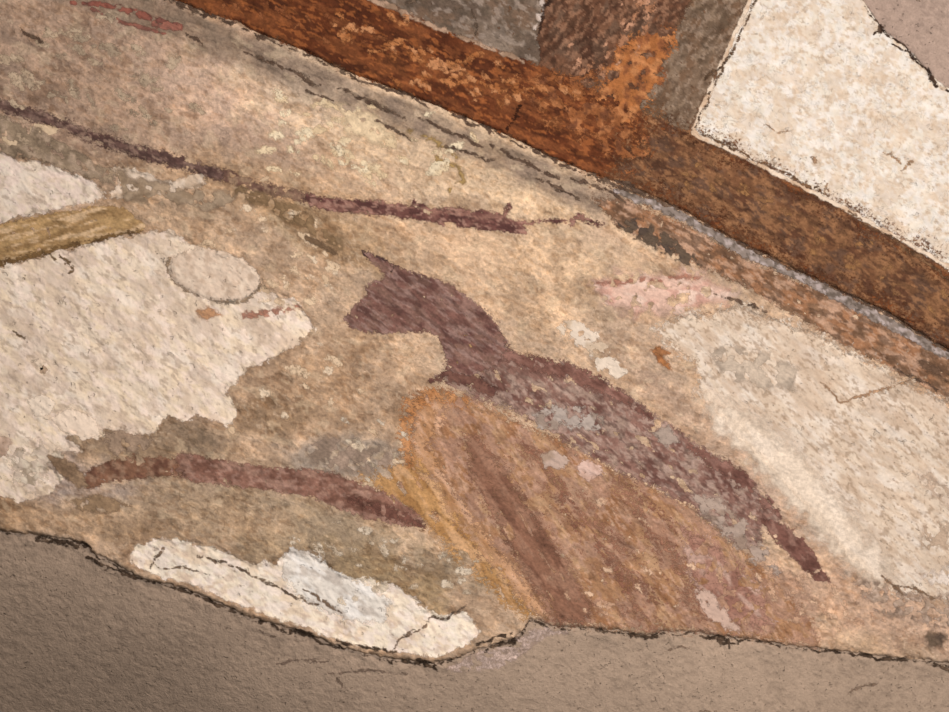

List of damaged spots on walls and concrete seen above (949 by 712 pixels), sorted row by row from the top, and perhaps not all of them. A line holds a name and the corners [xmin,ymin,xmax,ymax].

peeling [0,53,96,110]
peeling [0,122,205,223]
peeling [241,204,269,233]
peeling [0,219,343,503]
peeling [532,400,604,431]
peeling [345,438,376,468]
peeling [649,300,949,604]
peeling [357,526,422,571]
peeling [130,537,481,658]
crack [2,531,949,693]
peeling [583,592,615,616]
peeling [695,589,740,631]